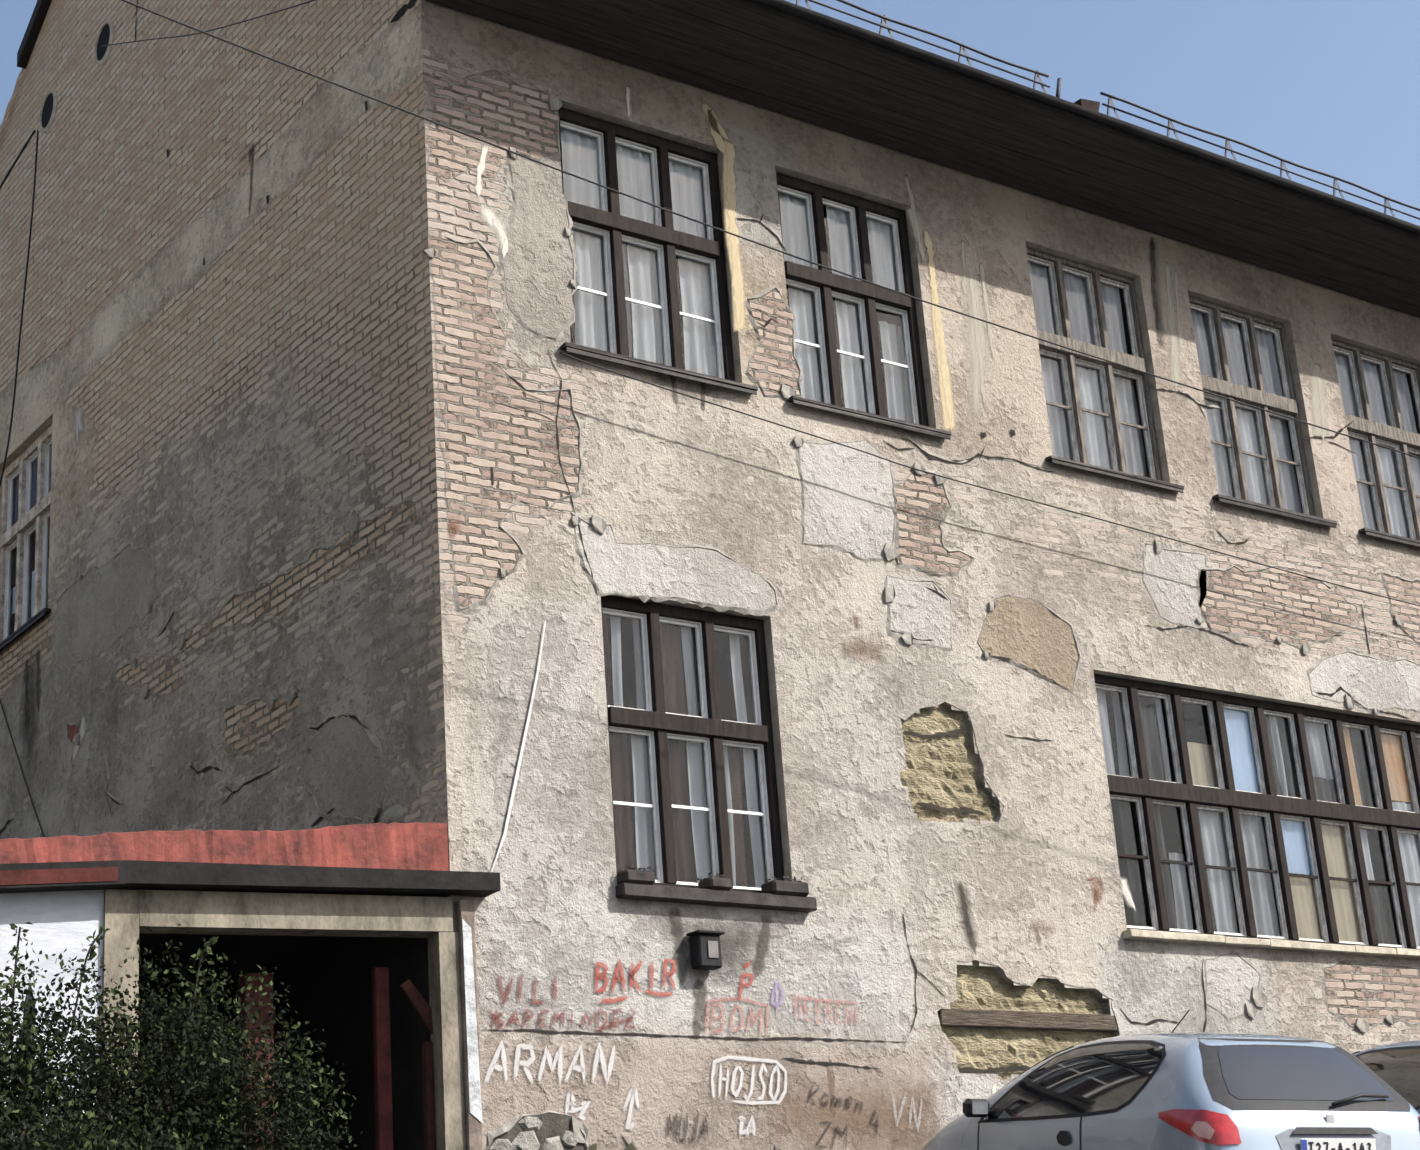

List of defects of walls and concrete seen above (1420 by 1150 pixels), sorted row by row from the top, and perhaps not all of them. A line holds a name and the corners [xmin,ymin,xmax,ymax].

spalling [422,69,778,616]
crack [883,437,1054,472]
spalling [114,500,417,700]
flaking render [792,436,975,652]
flaking render [977,594,1082,694]
spalling [1142,540,1420,716]
crack [189,764,279,805]
spalling [223,685,303,761]
crack [309,713,369,730]
spalling [888,689,1013,839]
spalling [925,945,1129,1094]
spalling [1321,957,1420,1033]